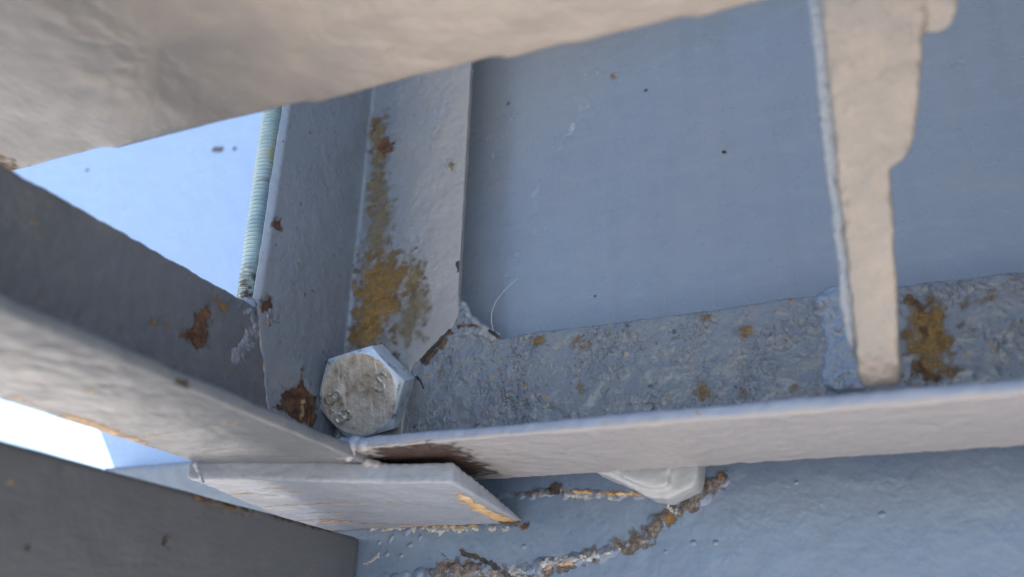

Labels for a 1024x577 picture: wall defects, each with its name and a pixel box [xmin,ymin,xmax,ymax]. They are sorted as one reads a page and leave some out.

rust [349,118,431,347]
rust [181,300,227,349]
rust [901,294,959,380]
rust [277,375,317,427]
rust [371,440,498,476]